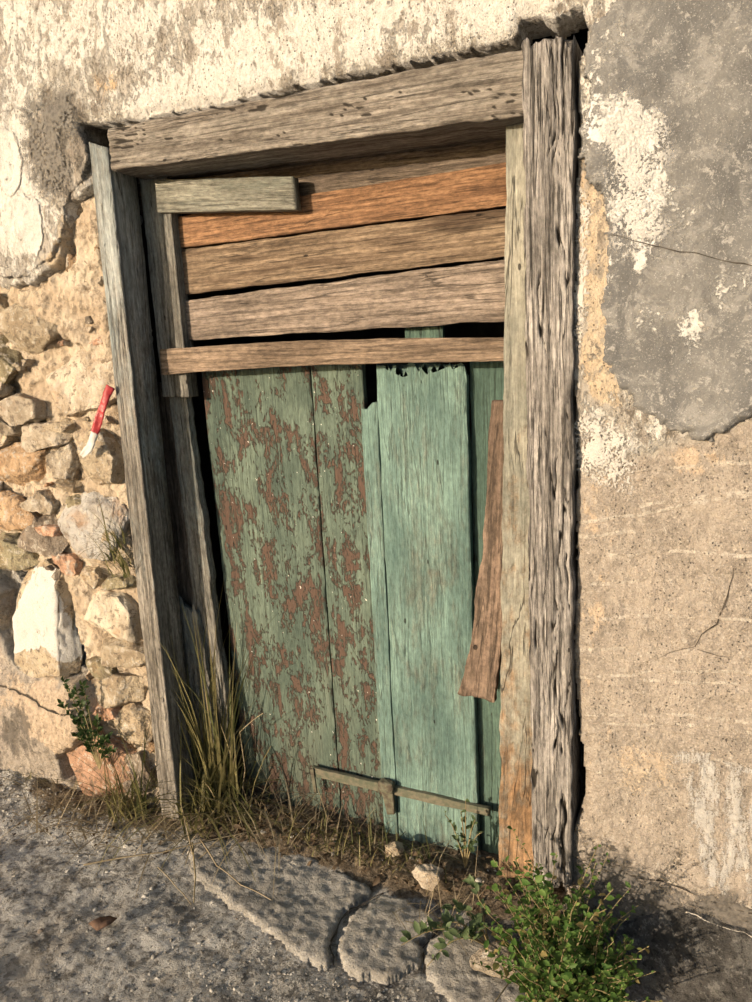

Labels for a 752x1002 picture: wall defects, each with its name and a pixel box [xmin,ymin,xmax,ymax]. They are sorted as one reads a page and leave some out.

peeling [601,94,672,257]
spalling [0,106,161,808]
crack [670,568,734,657]
crack [0,685,66,716]
crack [620,869,752,938]